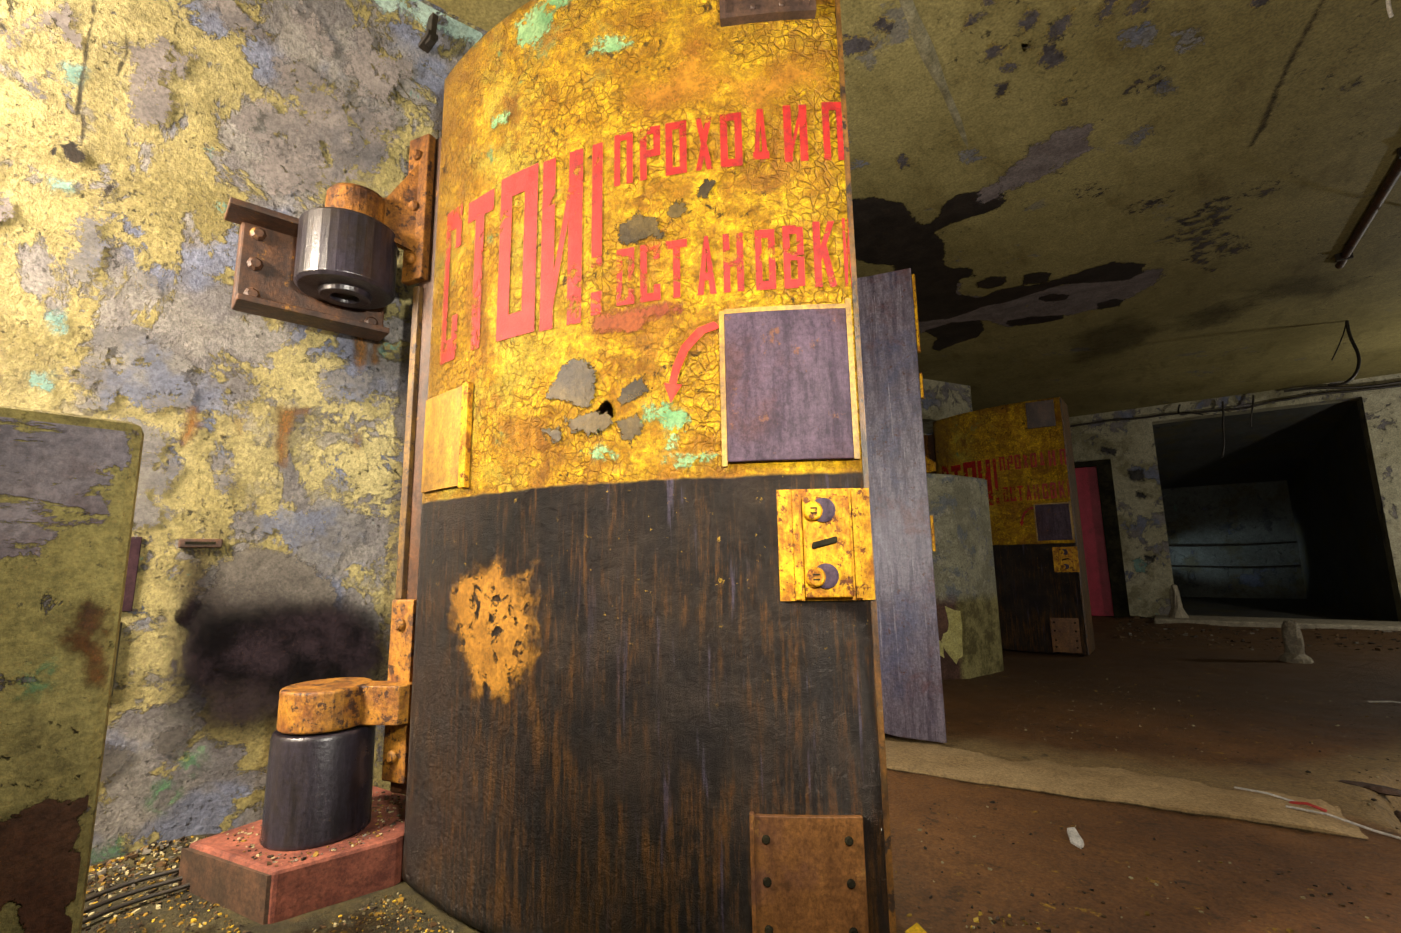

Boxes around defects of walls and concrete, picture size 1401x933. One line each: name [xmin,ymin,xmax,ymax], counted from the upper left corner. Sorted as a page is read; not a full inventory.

spalling [51,140,85,164]
peeling [115,34,199,131]
peeling [202,0,417,198]
peeling [375,0,482,47]
peeling [514,0,572,50]
peeling [63,179,173,299]
spalling [915,268,1166,333]
peeling [0,319,195,560]
peeling [540,357,718,469]
flaking render [191,463,373,629]
rust [449,562,541,703]
spalling [0,795,89,933]